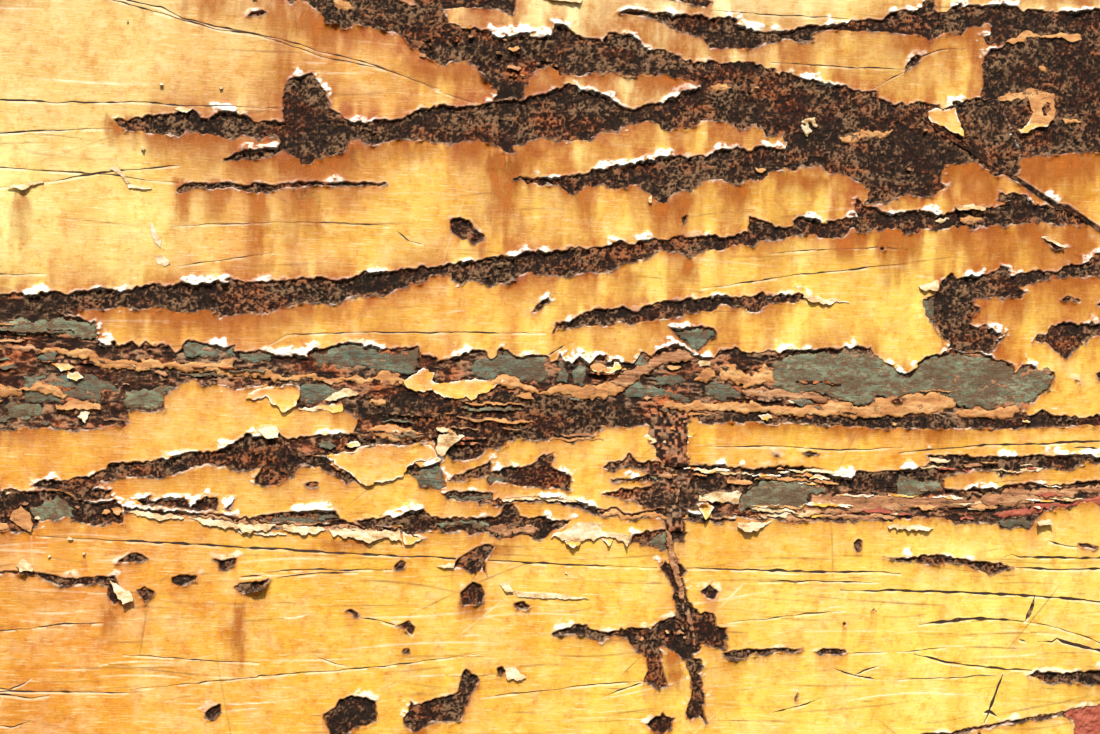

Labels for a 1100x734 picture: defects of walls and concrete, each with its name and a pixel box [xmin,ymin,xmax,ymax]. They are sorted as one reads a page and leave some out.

corrosion [621,0,1100,183]
peeling [25,0,1100,316]
corrosion [322,389,644,460]
corrosion [697,410,1100,440]
peeling [0,253,1100,721]
corrosion [686,455,1100,494]
crack [37,535,456,560]
crack [488,560,657,568]
crack [700,554,1100,652]
peeling [324,696,377,734]
peeling [404,669,478,731]
crack [914,654,1032,734]